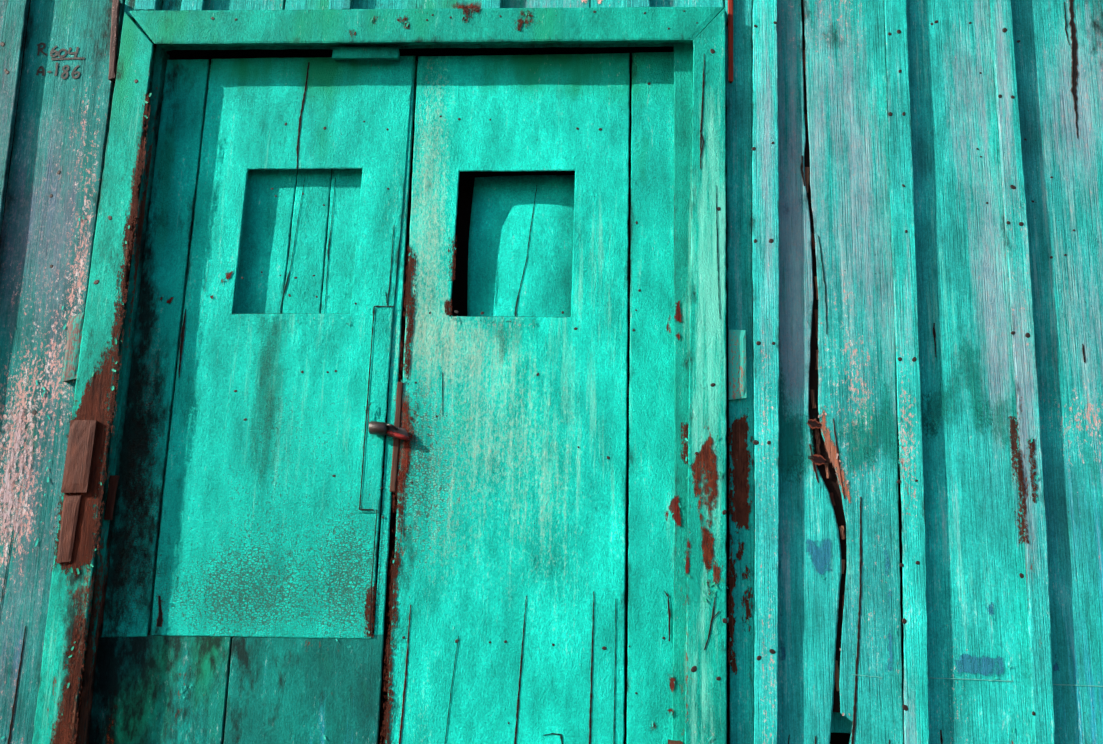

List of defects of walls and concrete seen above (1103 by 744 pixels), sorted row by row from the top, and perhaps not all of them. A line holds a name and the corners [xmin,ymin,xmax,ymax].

rust [453,2,482,23]
crack [1064,0,1078,138]
crack [800,0,882,744]
peeling [0,407,33,540]
rust [396,391,416,501]